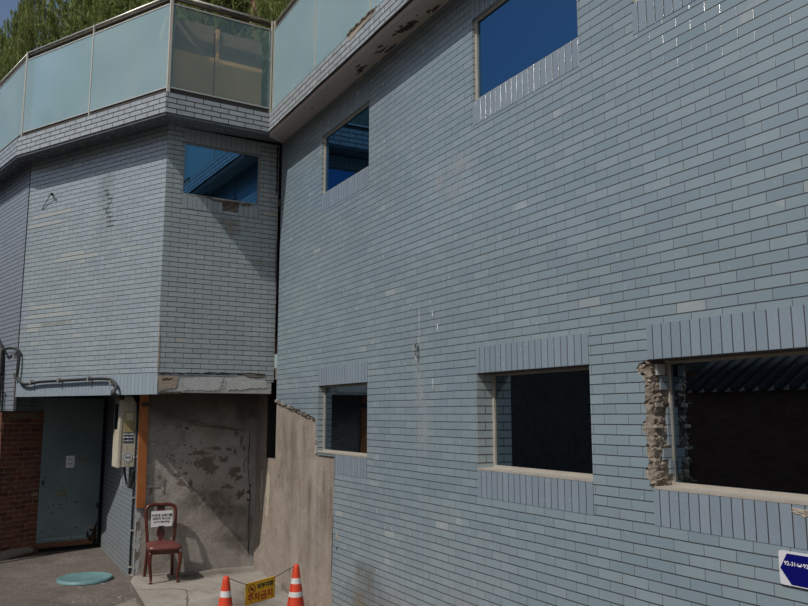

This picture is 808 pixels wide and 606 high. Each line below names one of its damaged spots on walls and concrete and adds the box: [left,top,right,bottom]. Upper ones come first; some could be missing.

spalling [346,6,377,42]
peeling [375,4,440,54]
peeling [135,424,251,517]
peeling [132,508,142,573]